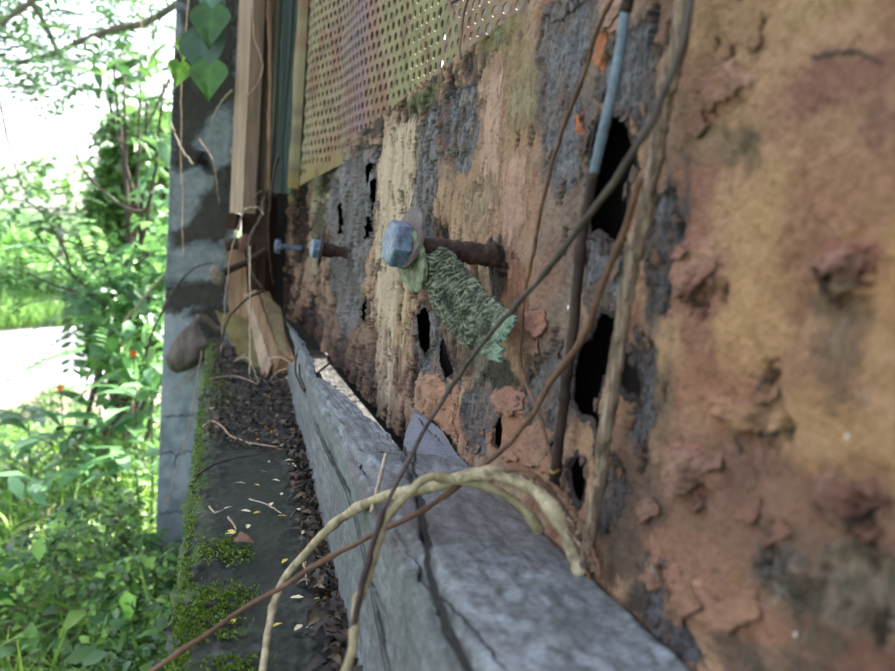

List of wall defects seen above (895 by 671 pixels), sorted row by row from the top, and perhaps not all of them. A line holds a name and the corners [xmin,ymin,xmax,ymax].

spalling [411,84,480,238]
spalling [535,0,670,200]
peeling [686,68,741,139]
spalling [325,143,383,343]
spalling [582,234,625,315]
spalling [643,178,718,315]
spalling [409,309,564,475]
spalling [623,326,661,466]
crack [402,418,506,671]
peeling [638,555,762,670]